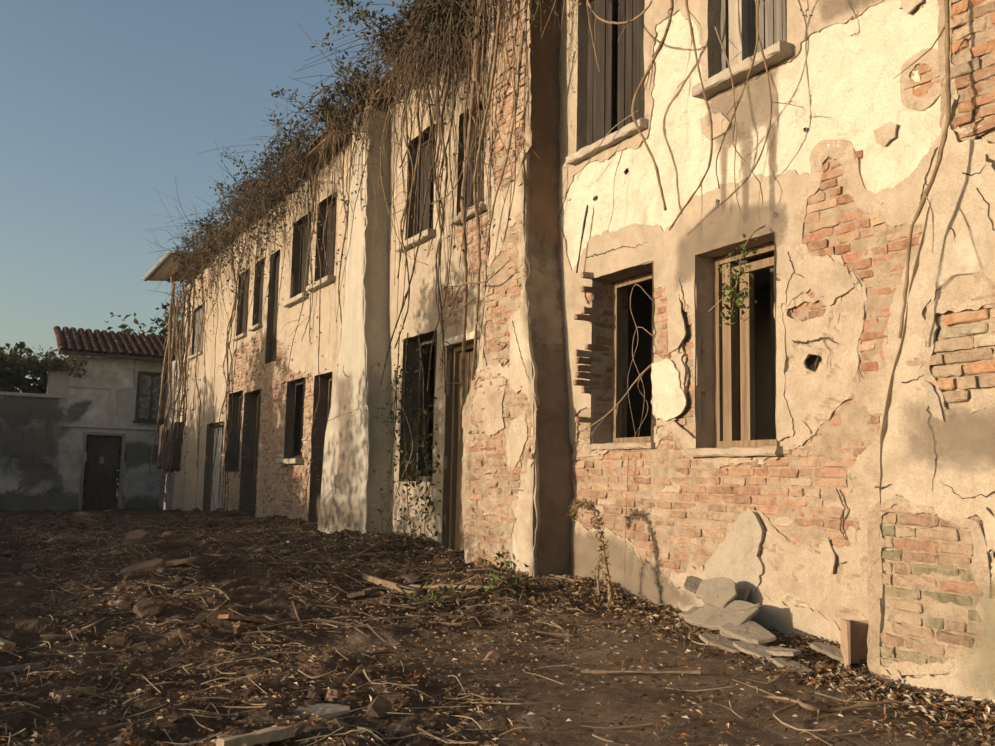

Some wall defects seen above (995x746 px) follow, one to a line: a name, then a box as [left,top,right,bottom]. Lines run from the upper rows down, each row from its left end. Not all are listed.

flaking render [485,0,532,200]
crack [962,154,995,231]
flaking render [219,331,318,521]
flaking render [437,202,538,569]
peeling [559,0,995,678]
crack [932,452,995,516]